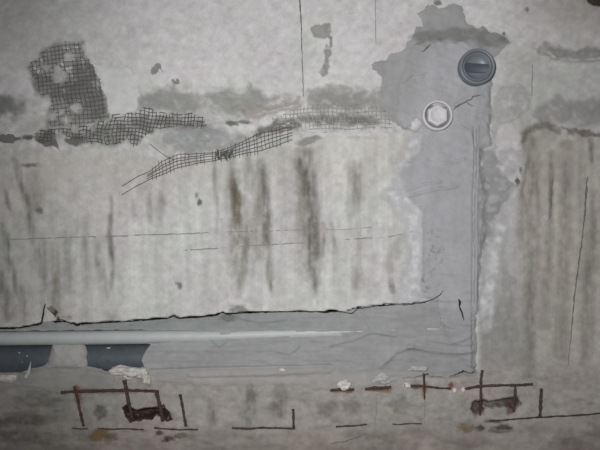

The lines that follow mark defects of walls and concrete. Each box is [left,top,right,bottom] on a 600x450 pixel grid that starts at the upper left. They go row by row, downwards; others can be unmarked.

crack [297,0,305,97]
spalling [311,23,332,76]
peeling [0,41,108,148]
peeling [204,87,300,126]
spalling [257,118,300,137]
peeling [309,87,376,124]
water stain [231,182,242,224]
crack [458,128,478,372]
crack [568,177,588,364]
crack [0,291,443,329]